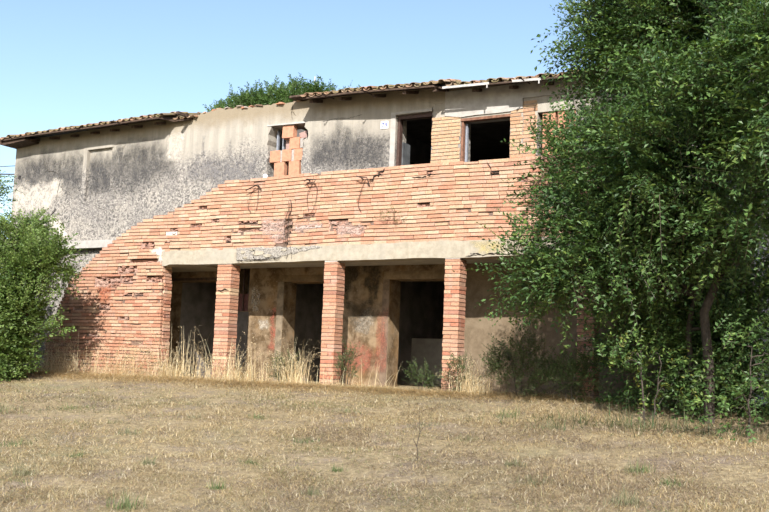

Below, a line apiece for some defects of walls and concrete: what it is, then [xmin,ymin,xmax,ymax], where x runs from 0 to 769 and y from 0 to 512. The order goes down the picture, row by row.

damp [16,160,81,189]
damp [91,150,171,191]
damp [314,137,383,164]
spalling [226,214,365,261]
spalling [95,260,159,295]
damp [343,266,381,328]